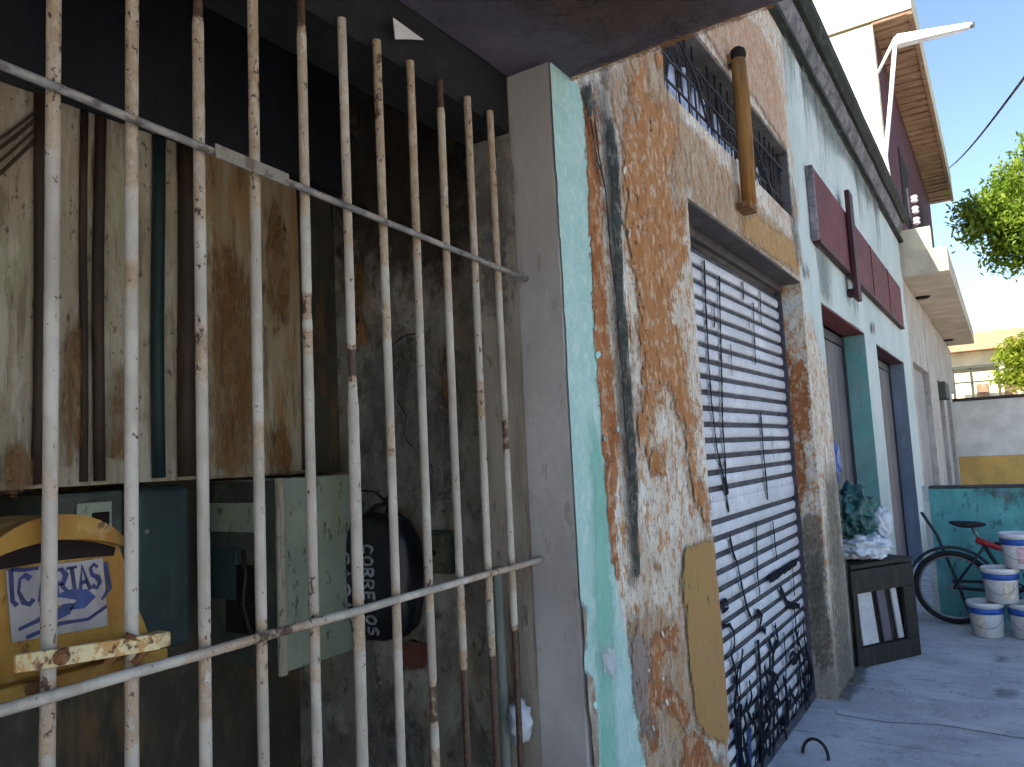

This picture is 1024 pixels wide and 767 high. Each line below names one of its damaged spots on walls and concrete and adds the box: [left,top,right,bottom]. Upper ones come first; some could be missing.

peeling [583,108,621,579]
peeling [583,601,724,767]
peeling [606,49,812,534]
water stain [801,460,855,693]